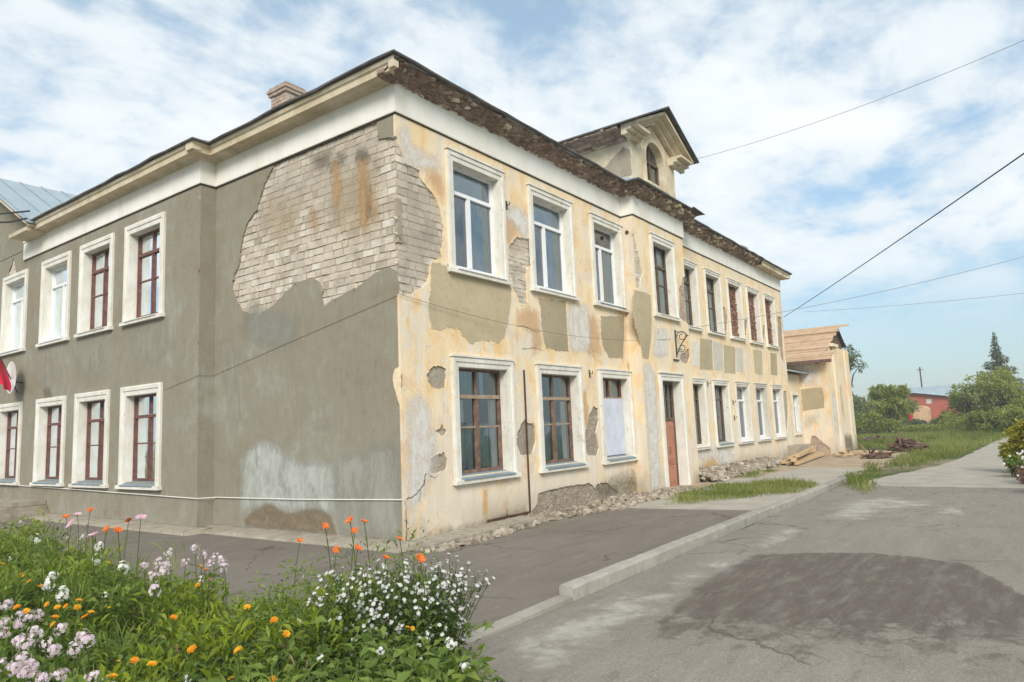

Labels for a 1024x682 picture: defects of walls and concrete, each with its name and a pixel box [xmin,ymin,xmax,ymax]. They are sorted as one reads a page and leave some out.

flaking render [604,147,632,177]
flaking render [233,123,568,351]
flaking render [427,365,445,389]
flaking render [517,420,537,456]
flaking render [585,405,600,456]
water stain [242,397,437,534]
flaking render [430,452,446,474]
crack [405,474,437,540]
flaking render [532,482,618,515]